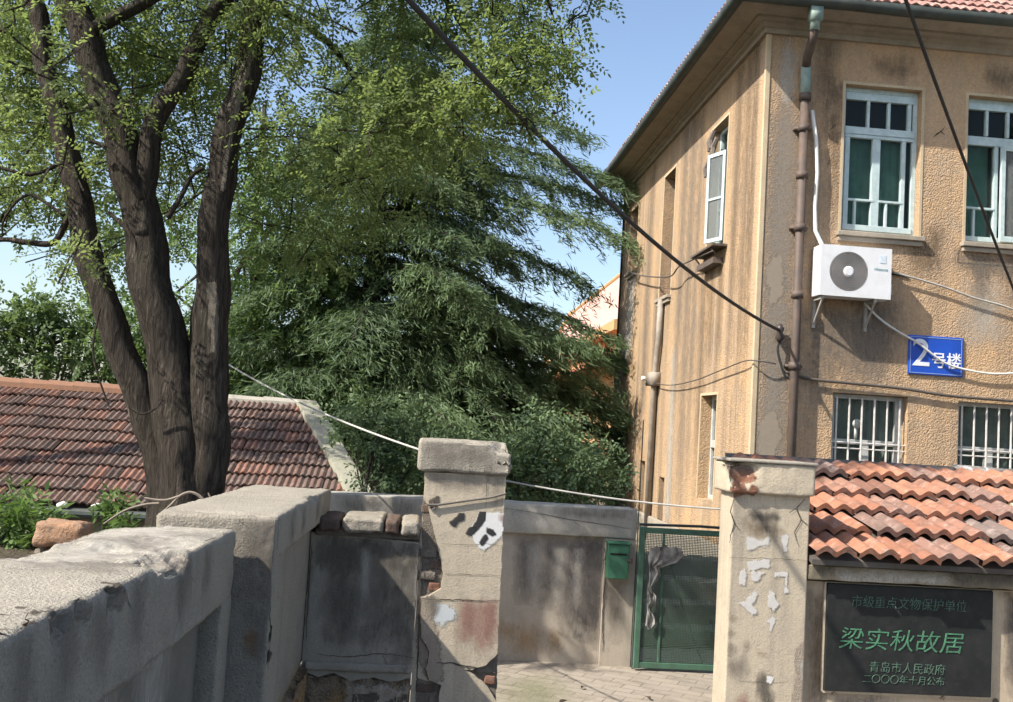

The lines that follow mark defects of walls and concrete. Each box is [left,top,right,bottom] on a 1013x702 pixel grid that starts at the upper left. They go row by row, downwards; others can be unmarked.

crack [729,499,809,561]
spalling [15,597,93,634]
spalling [100,581,127,611]
flaking render [343,496,444,702]
water stain [520,542,619,624]
flaking render [468,655,498,699]